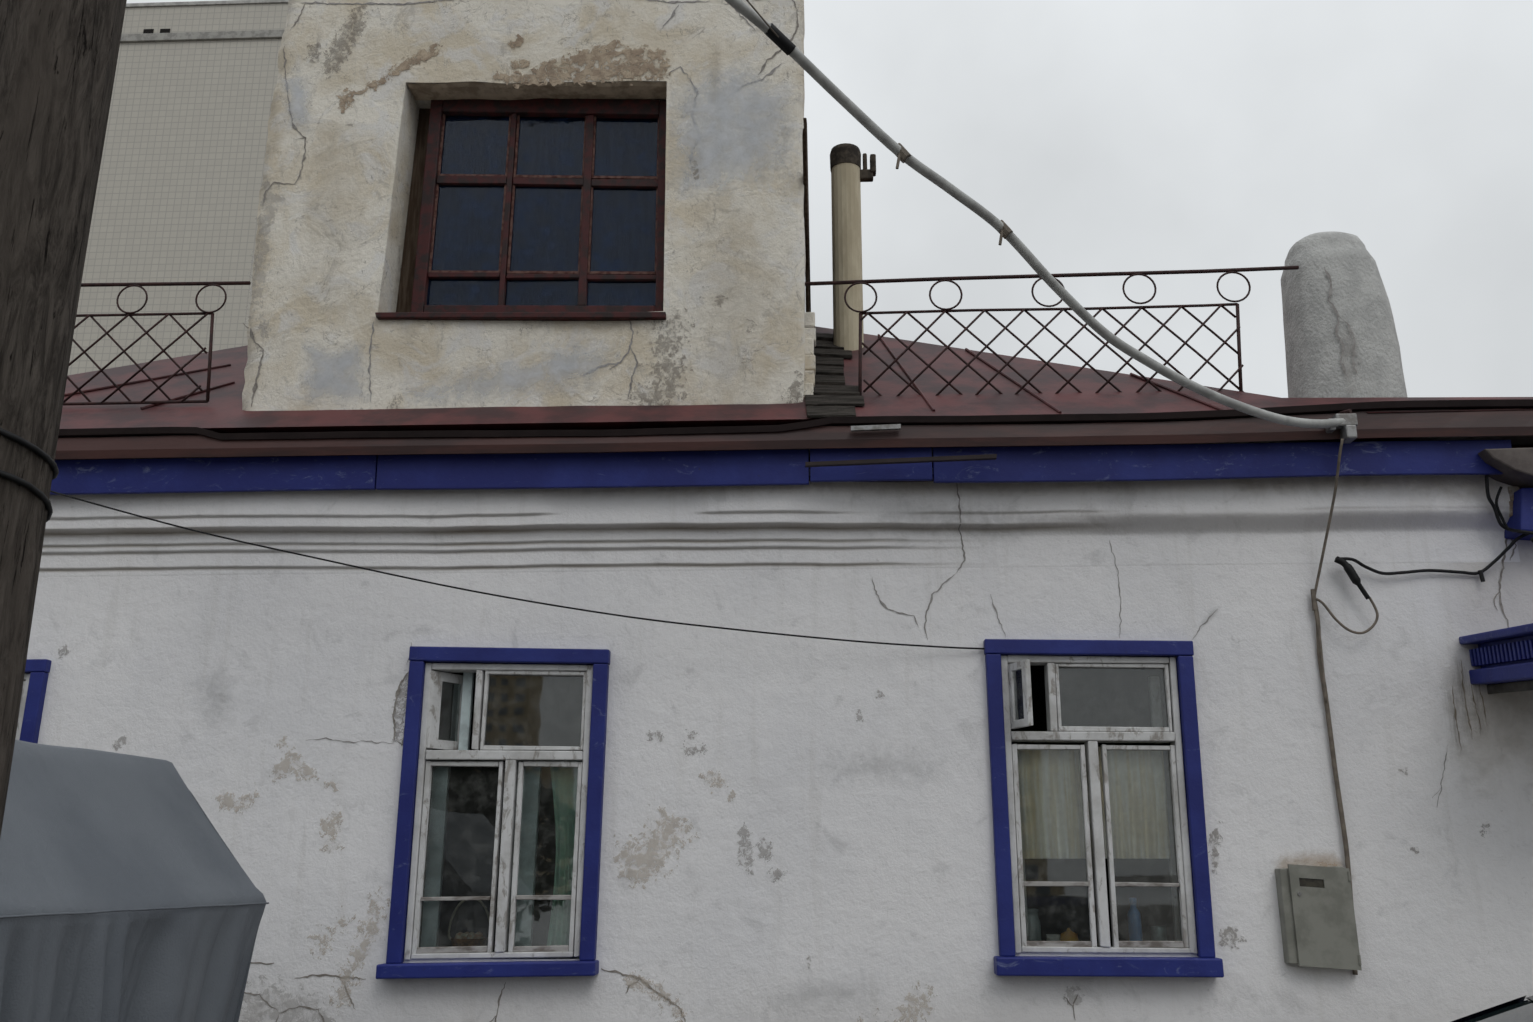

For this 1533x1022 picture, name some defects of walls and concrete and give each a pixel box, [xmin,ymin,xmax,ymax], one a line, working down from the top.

spalling [336,43,443,113]
spalling [492,34,671,89]
crack [1324,267,1358,377]
crack [243,323,264,407]
crack [872,483,966,639]
crack [1110,543,1122,638]
water stain [1452,662,1487,750]
peeling [736,822,782,883]
crack [244,962,365,1022]